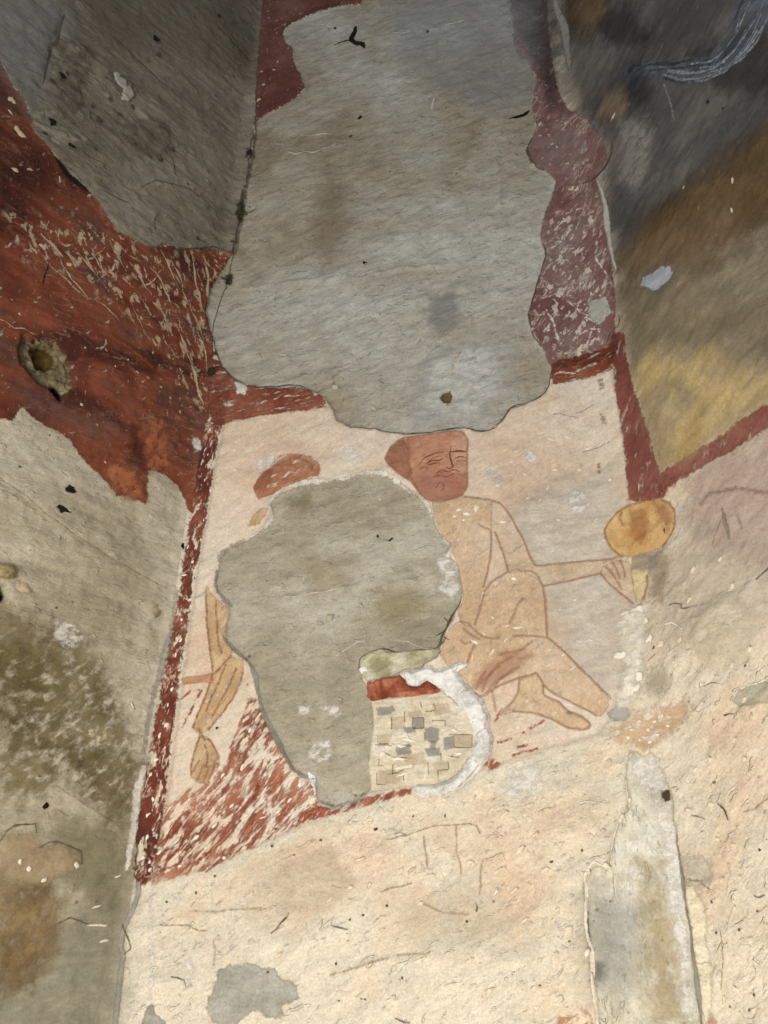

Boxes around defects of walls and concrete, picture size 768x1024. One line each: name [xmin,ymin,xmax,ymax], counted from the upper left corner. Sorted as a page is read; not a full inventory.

flaking render [0,0,279,412]
crack [55,119,314,392]
flaking render [641,266,673,291]
peeling [141,419,170,471]
peeling [104,459,146,501]
flaking render [172,538,205,601]
flaking render [359,646,440,701]
spalling [565,706,722,1024]
flaking render [142,1005,165,1024]
flaking render [206,951,299,1024]